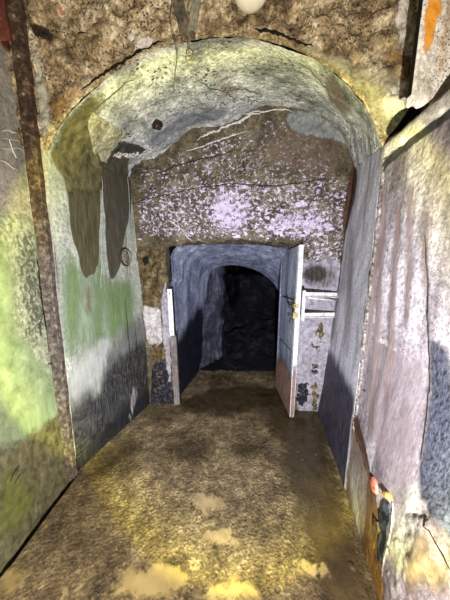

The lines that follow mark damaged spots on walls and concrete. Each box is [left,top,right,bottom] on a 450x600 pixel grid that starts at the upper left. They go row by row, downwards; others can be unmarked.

crack [254,28,313,47]
crack [81,41,163,90]
water stain [51,95,150,471]